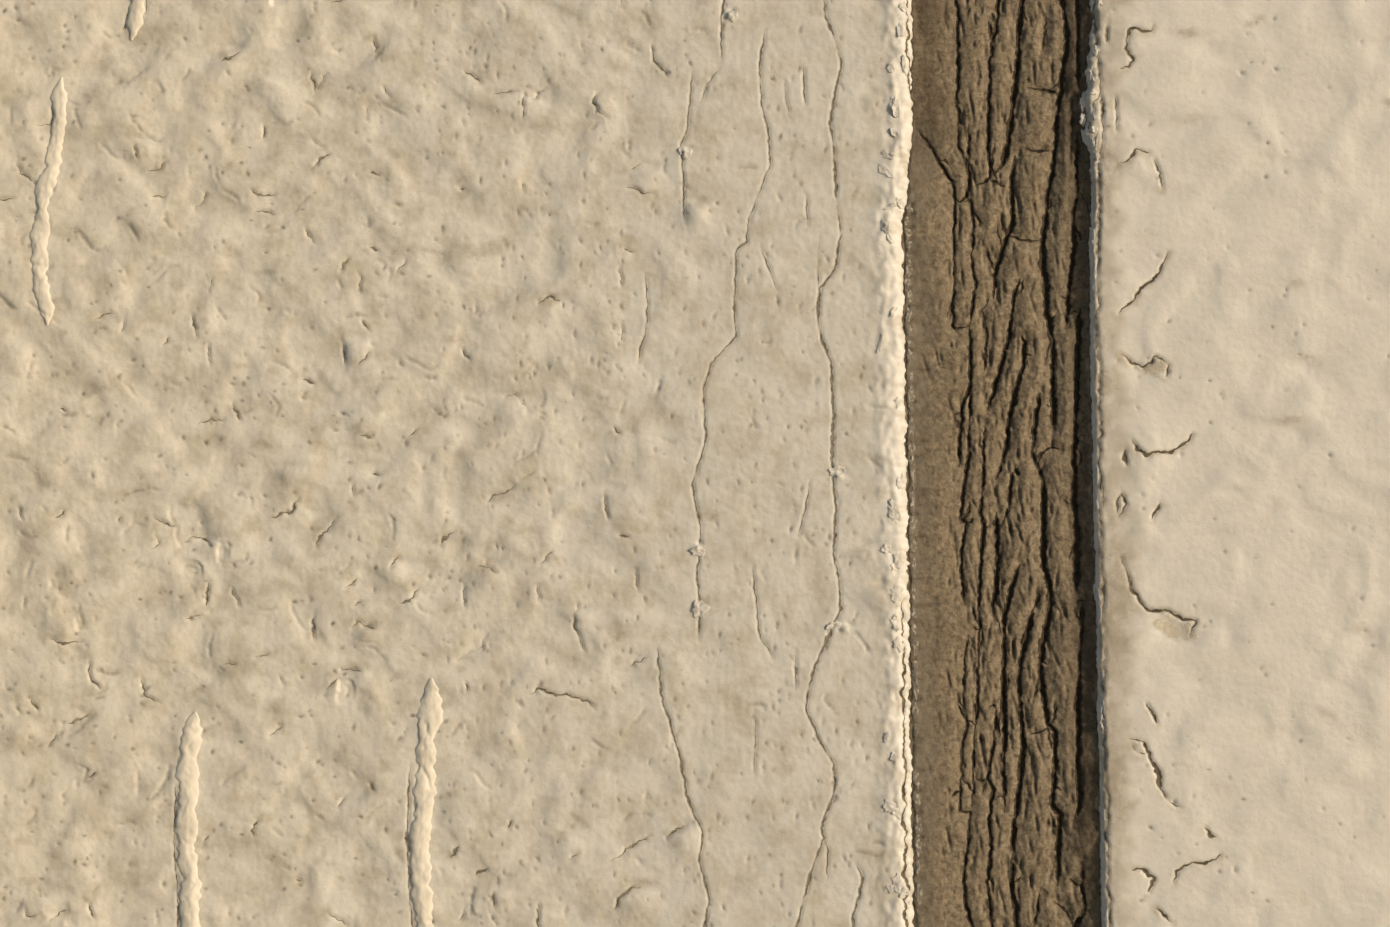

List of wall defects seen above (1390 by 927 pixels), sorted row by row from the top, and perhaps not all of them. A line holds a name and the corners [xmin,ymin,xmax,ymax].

crack [652,0,725,224]
crack [619,249,648,365]
crack [691,1,864,927]
crack [900,0,1221,927]
crack [614,647,710,927]